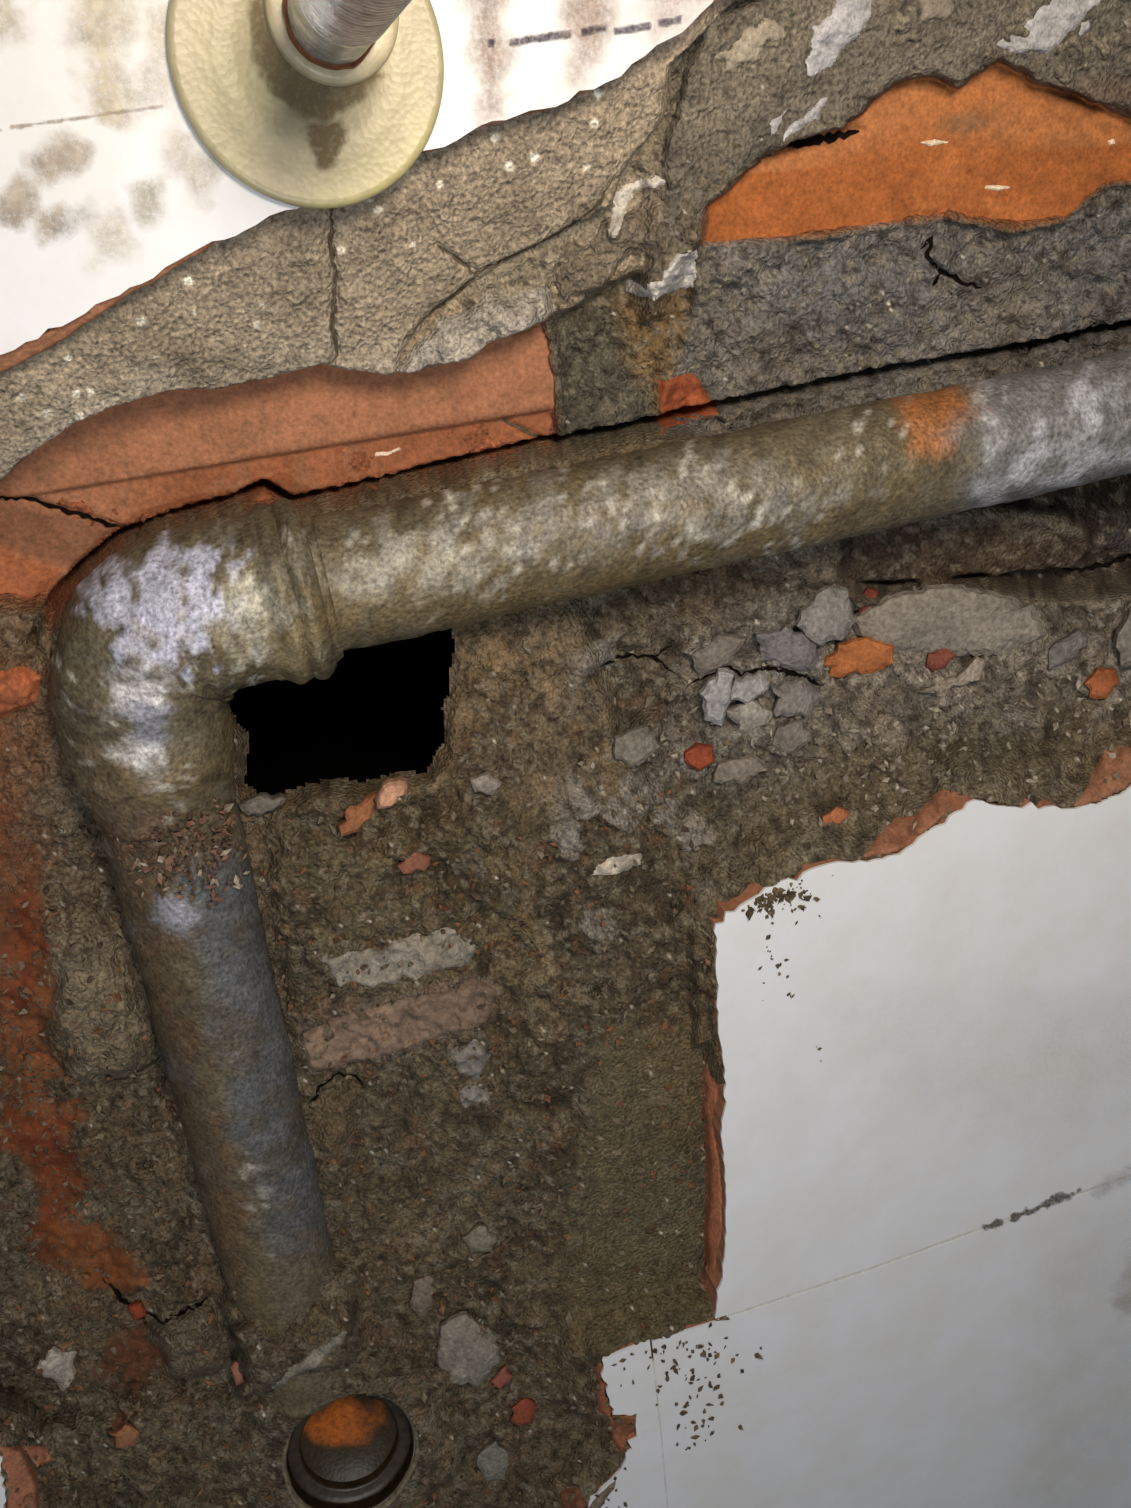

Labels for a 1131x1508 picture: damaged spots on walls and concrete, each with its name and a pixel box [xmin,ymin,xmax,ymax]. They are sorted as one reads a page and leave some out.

leakage [568,0,607,56]
crack [328,208,339,364]
crack [401,180,613,345]
spalling [0,0,1131,612]
crack [0,496,123,528]
flaking render [0,666,41,719]
spalling [1074,741,1131,806]
spalling [863,789,960,857]
flaking render [303,978,496,1074]
spalling [0,1444,52,1508]
rust [300,1394,397,1482]
spalling [593,1360,635,1453]